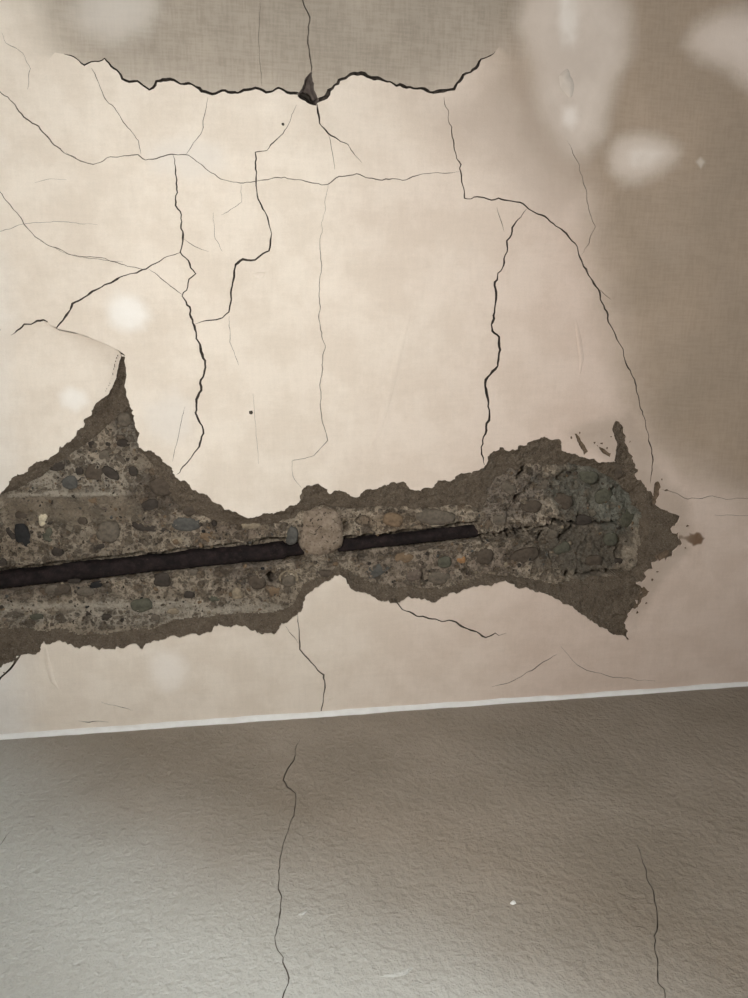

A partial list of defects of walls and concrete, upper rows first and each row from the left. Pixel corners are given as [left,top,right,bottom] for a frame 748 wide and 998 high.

crack [0,0,748,516]
crack [286,614,326,711]
spalling [0,350,689,668]
crack [393,598,506,638]
crack [275,745,297,998]
crack [636,842,666,998]